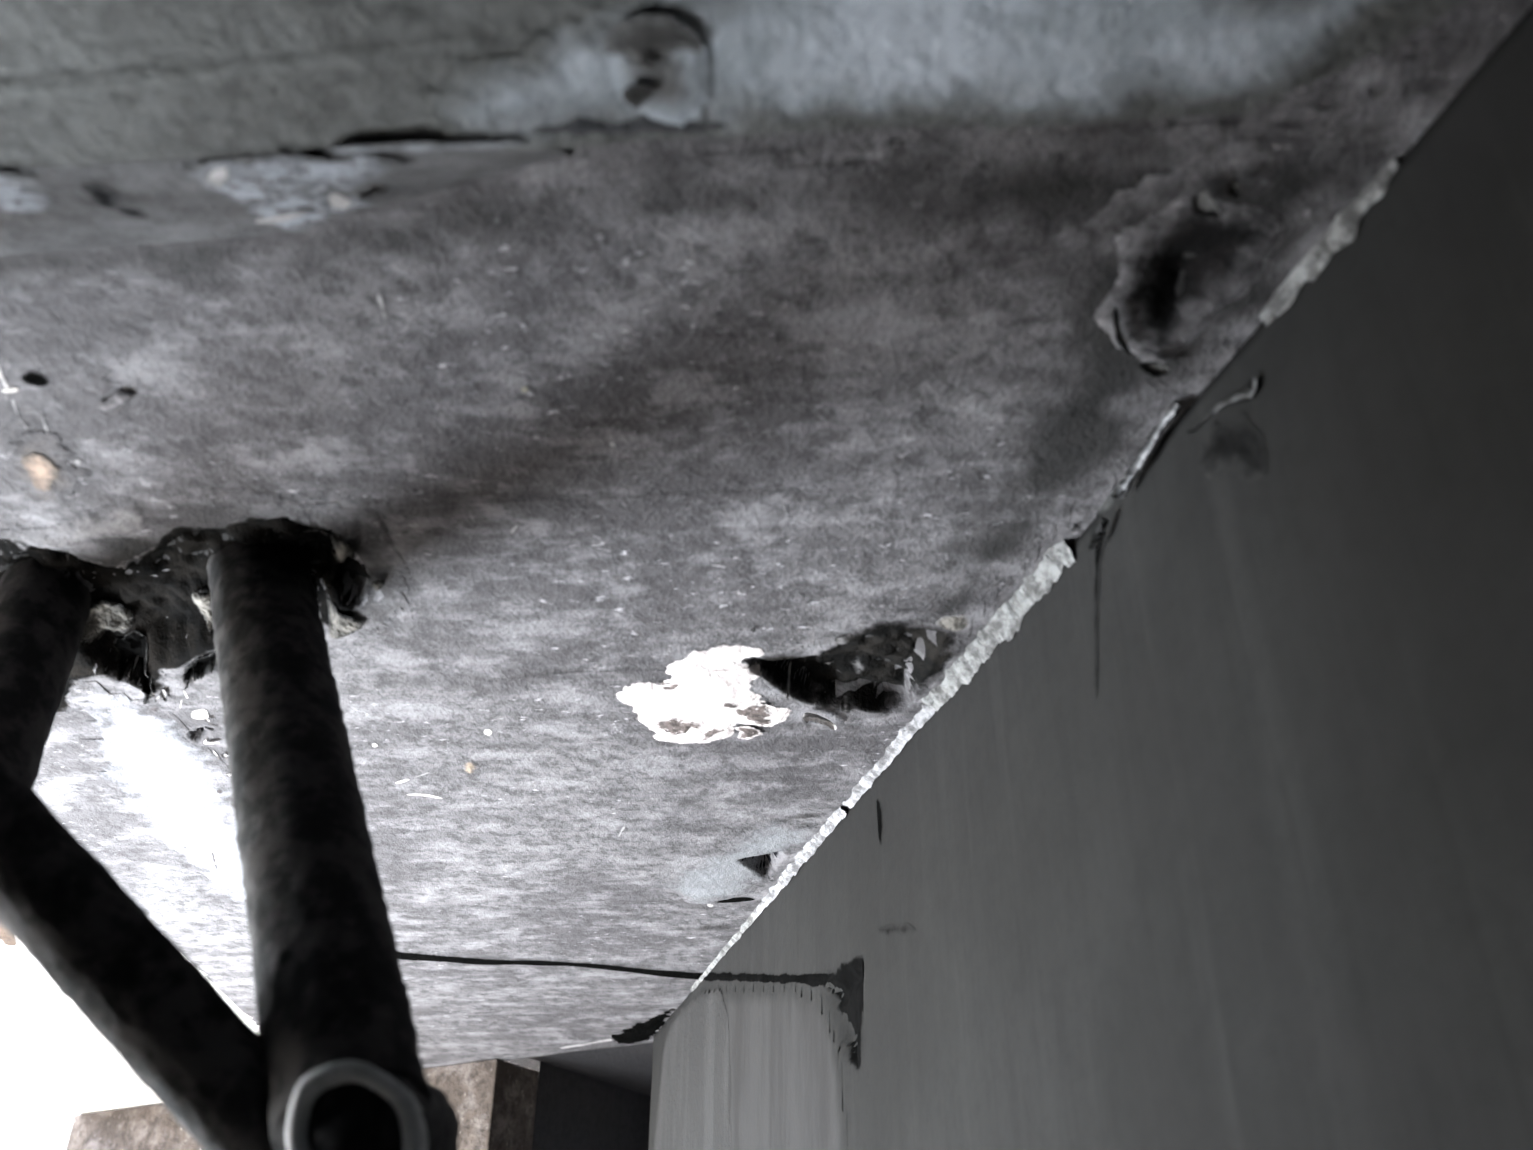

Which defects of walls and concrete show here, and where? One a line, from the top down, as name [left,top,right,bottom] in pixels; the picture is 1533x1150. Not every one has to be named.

spalling [0,498,385,794]
spalling [614,615,970,744]